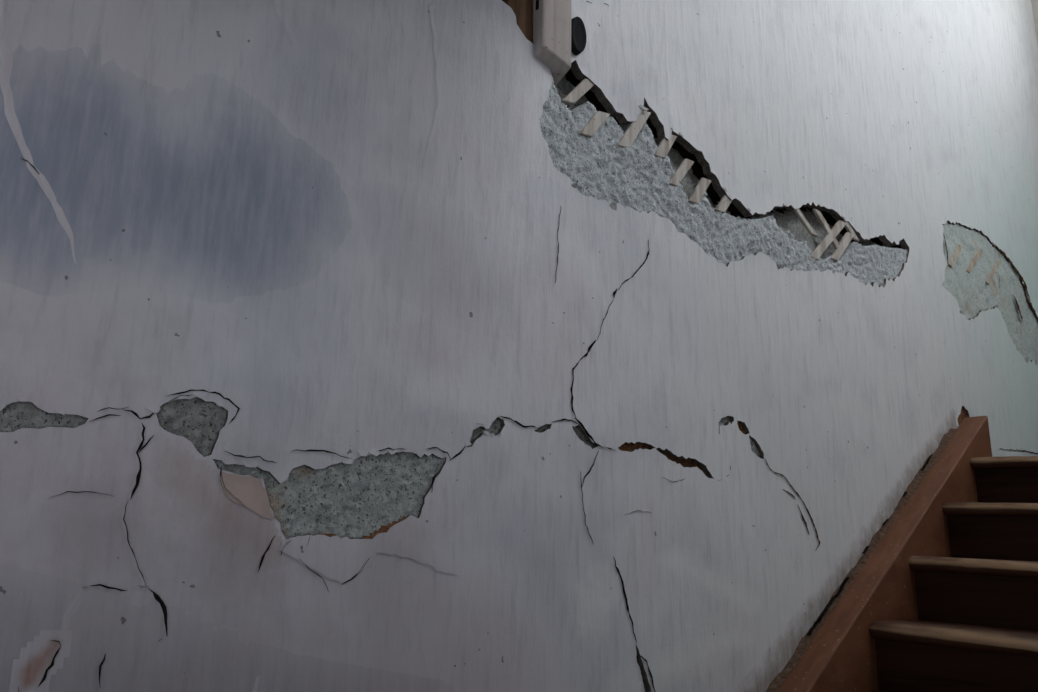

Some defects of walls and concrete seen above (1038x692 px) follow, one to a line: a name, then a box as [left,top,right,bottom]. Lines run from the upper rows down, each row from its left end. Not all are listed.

flaking render [502,0,533,43]
crack [554,210,562,283]
flaking render [539,75,907,287]
flaking render [942,222,1038,365]
crack [18,640,61,692]
flaking render [0,396,87,432]
crack [51,407,167,641]
crack [220,451,276,506]
flaking render [145,389,450,539]
crack [258,536,369,590]
crack [449,240,650,542]
crack [613,557,655,692]